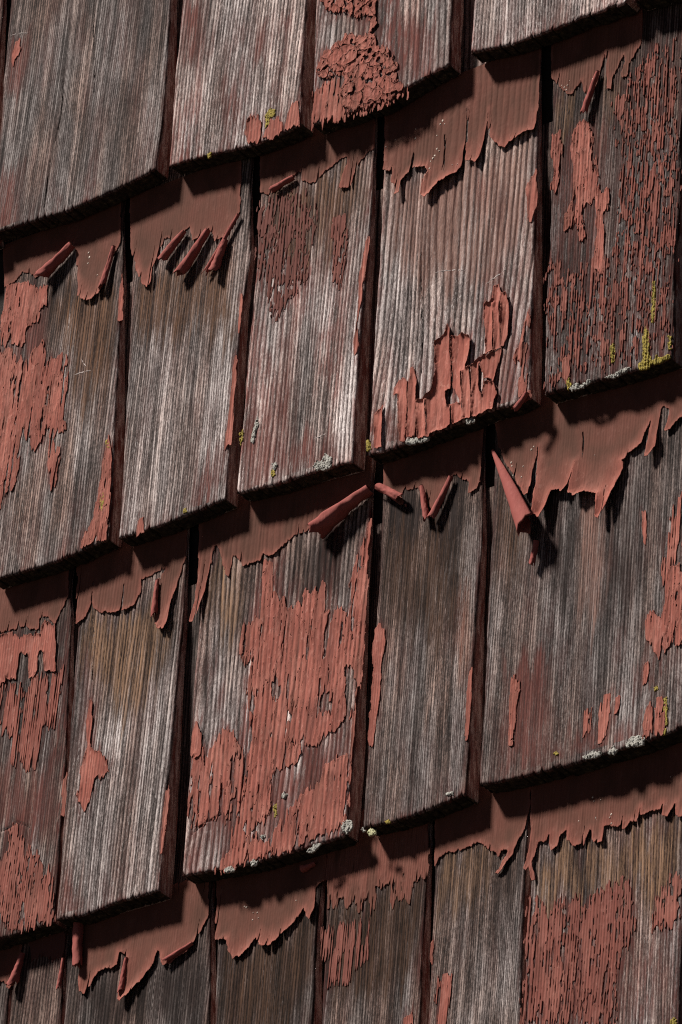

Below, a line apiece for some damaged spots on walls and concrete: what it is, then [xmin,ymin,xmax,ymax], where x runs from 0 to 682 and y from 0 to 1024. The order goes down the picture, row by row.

peeling [0,160,242,510]
peeling [245,0,541,321]
peeling [393,284,509,443]
peeling [491,8,682,566]
peeling [0,517,188,773]
peeling [72,428,682,1001]
peeling [0,821,56,989]
peeling [519,875,637,1024]